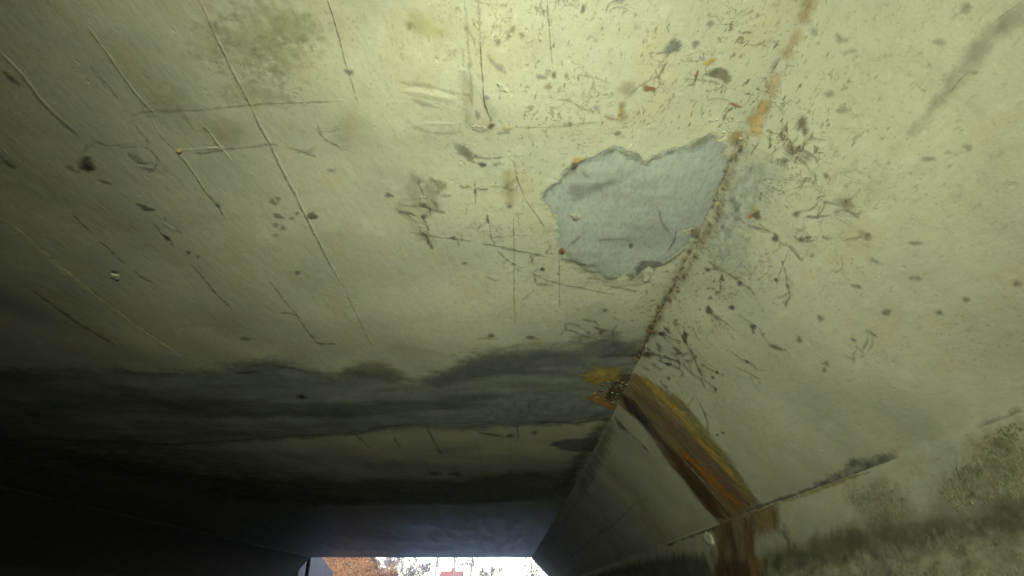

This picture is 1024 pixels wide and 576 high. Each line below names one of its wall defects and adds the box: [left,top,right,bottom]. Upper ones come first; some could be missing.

spalling [532,124,735,282]
damp [0,335,638,445]
damp [551,439,598,451]
rust [582,365,778,576]